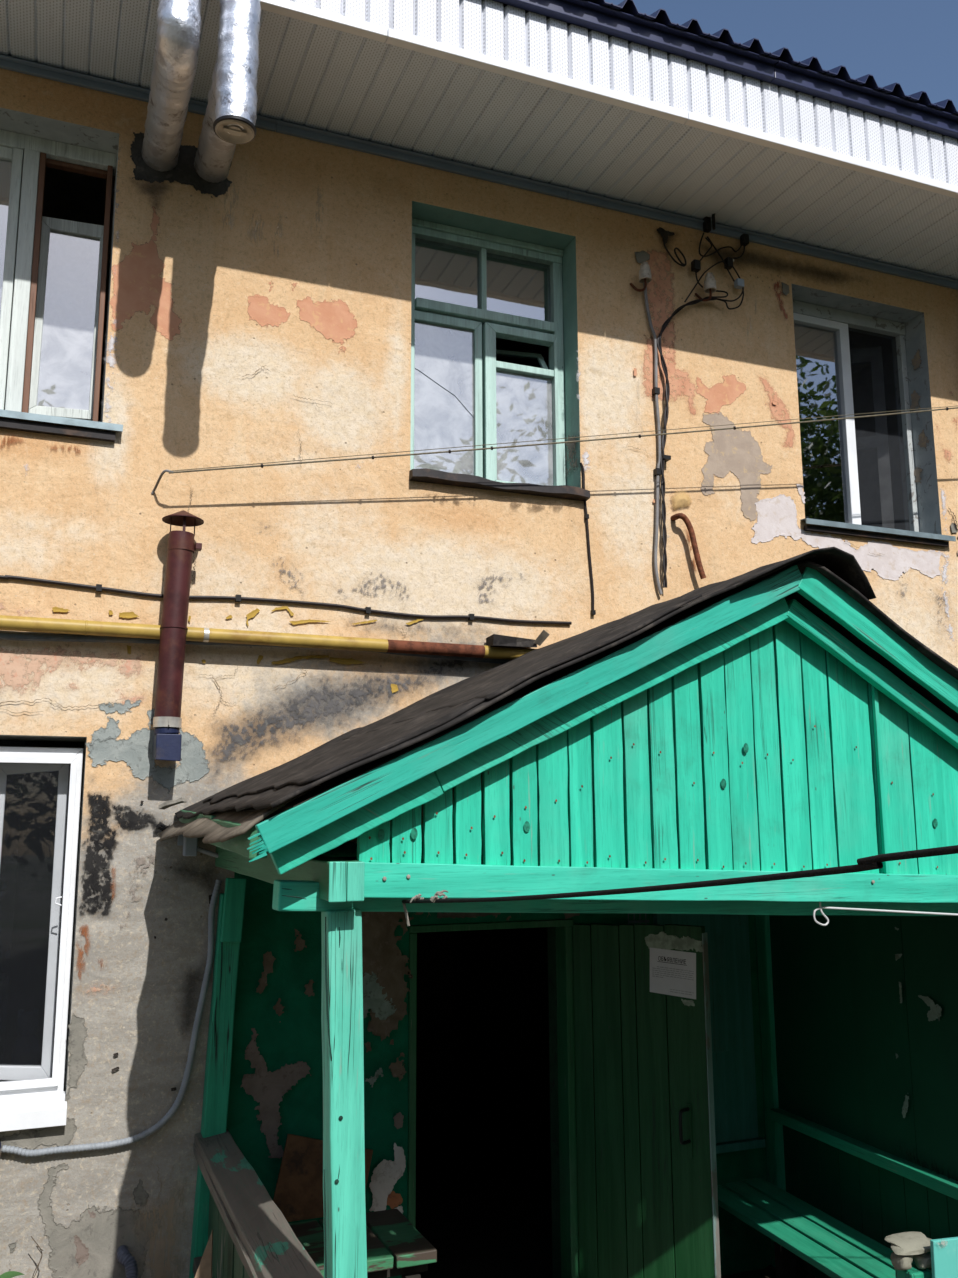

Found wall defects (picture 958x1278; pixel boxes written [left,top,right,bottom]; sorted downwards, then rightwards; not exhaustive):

peeling [109,206,182,341]
peeling [247,282,357,353]
peeling [634,227,942,581]
peeling [0,646,142,692]
peeling [122,694,155,728]
damp [212,660,465,772]
rust [387,639,485,658]
damp [79,794,170,915]
peeling [362,912,521,1087]
peeling [241,1028,311,1159]